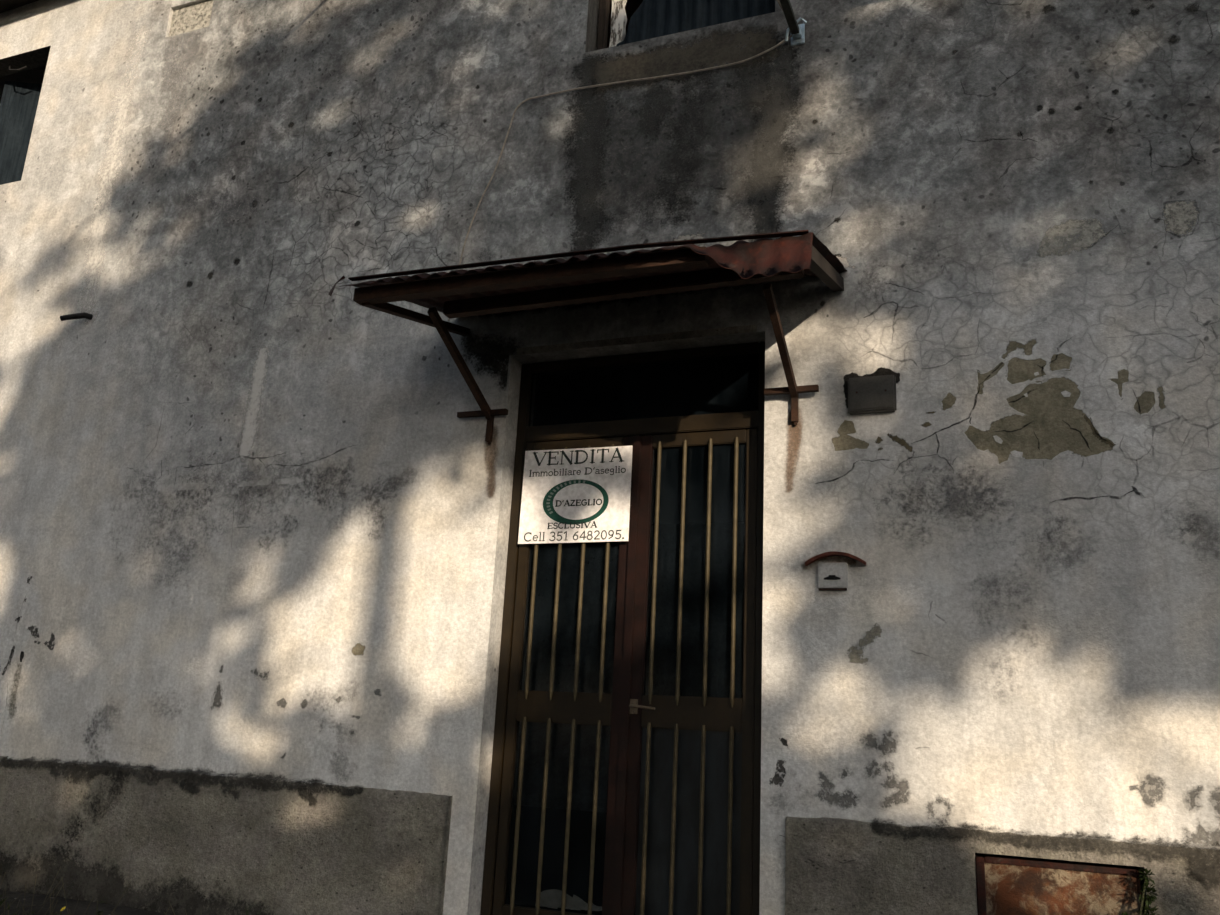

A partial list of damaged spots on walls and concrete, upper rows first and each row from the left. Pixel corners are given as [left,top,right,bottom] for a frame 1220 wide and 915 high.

leakage [563,25,801,259]
crack [952,127,1041,174]
crack [1149,124,1202,174]
crack [240,108,453,309]
peeling [827,367,913,457]
crack [816,360,1005,484]
peeling [922,339,1123,470]
peeling [1101,362,1165,421]
crack [1052,486,1141,502]
peeling [2,616,55,675]
leakage [0,756,363,915]
leakage [870,818,1220,889]